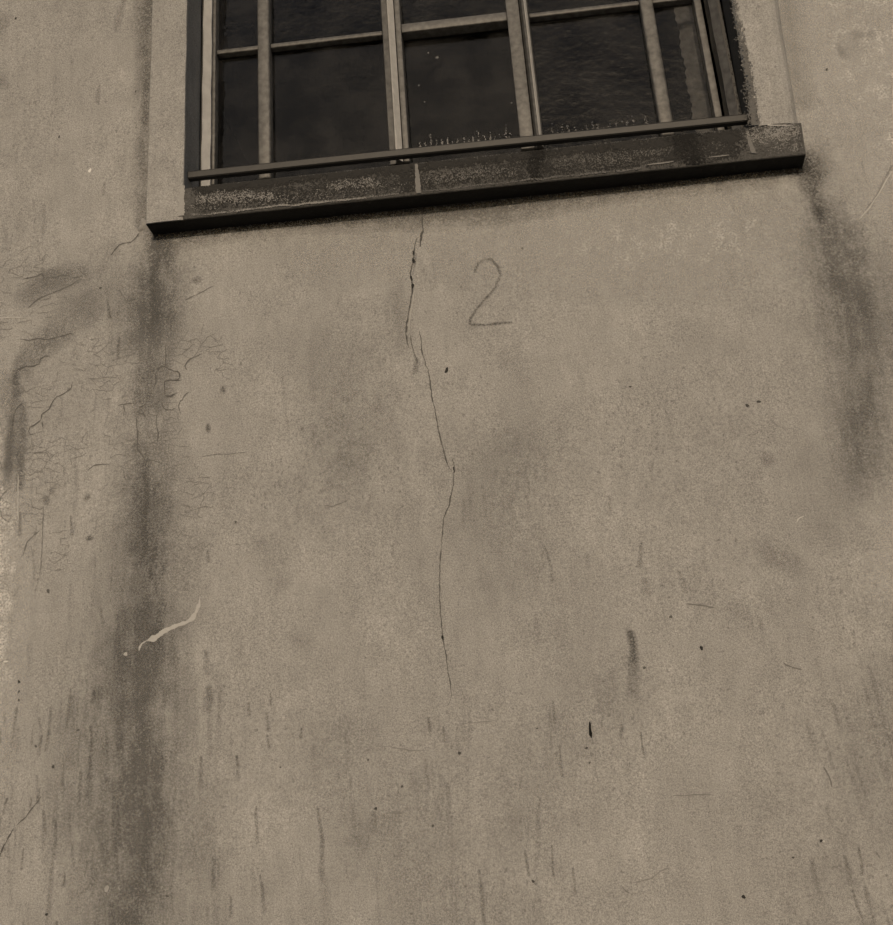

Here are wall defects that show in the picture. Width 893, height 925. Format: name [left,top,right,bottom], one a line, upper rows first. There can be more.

water stain [119,232,177,375]
water stain [815,162,878,356]
crack [405,207,455,704]
water stain [110,443,172,925]
peeling [139,597,201,650]